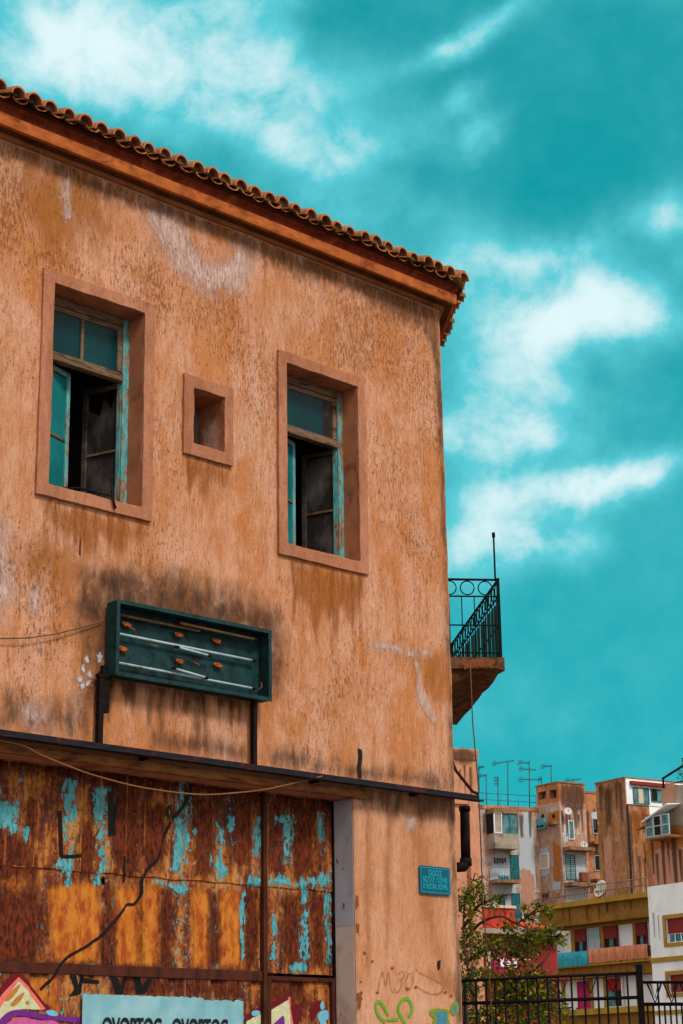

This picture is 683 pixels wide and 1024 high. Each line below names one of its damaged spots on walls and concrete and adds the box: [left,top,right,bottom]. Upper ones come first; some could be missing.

water stain [149,206,442,442]
peeling [0,787,30,842]
peeling [53,776,111,888]
rust [0,761,331,997]
peeling [155,782,197,894]
peeling [209,816,236,881]
peeling [239,811,359,975]